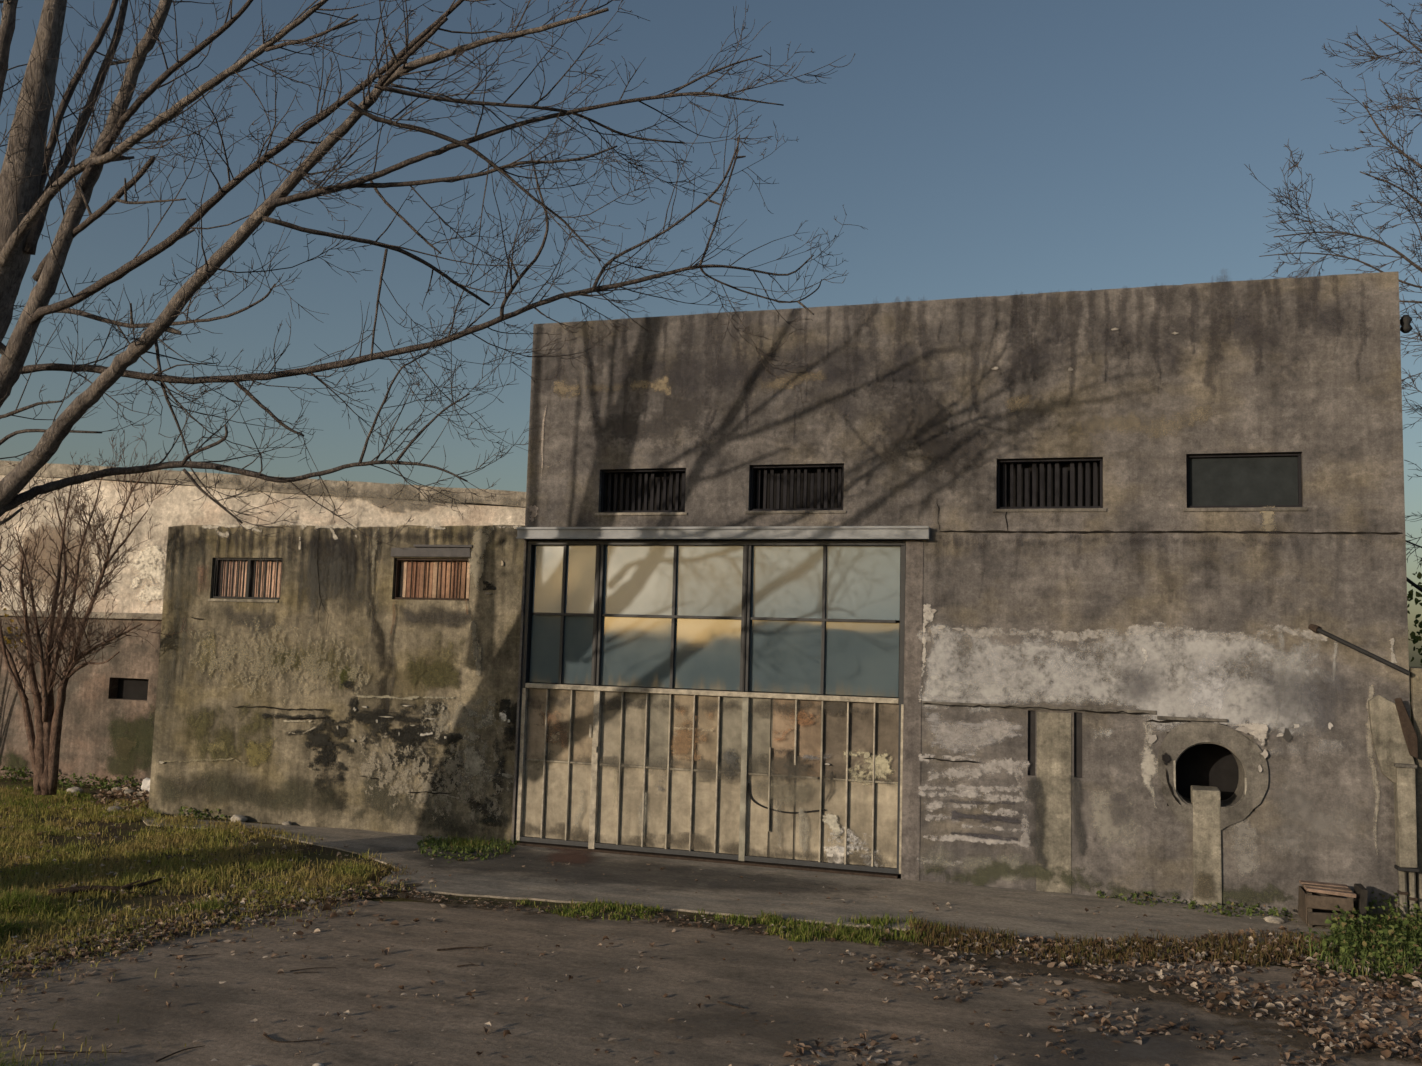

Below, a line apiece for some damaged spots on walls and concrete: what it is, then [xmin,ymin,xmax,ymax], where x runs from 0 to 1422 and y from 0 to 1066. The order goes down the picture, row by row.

water stain [596,351,865,447]
water stain [871,351,987,472]
water stain [196,477,522,511]
water stain [157,526,517,835]
peeling [919,604,963,701]
flaking render [337,697,514,823]
spalling [1162,753,1181,805]
flaking render [1235,723,1299,772]
water stain [414,849,829,892]